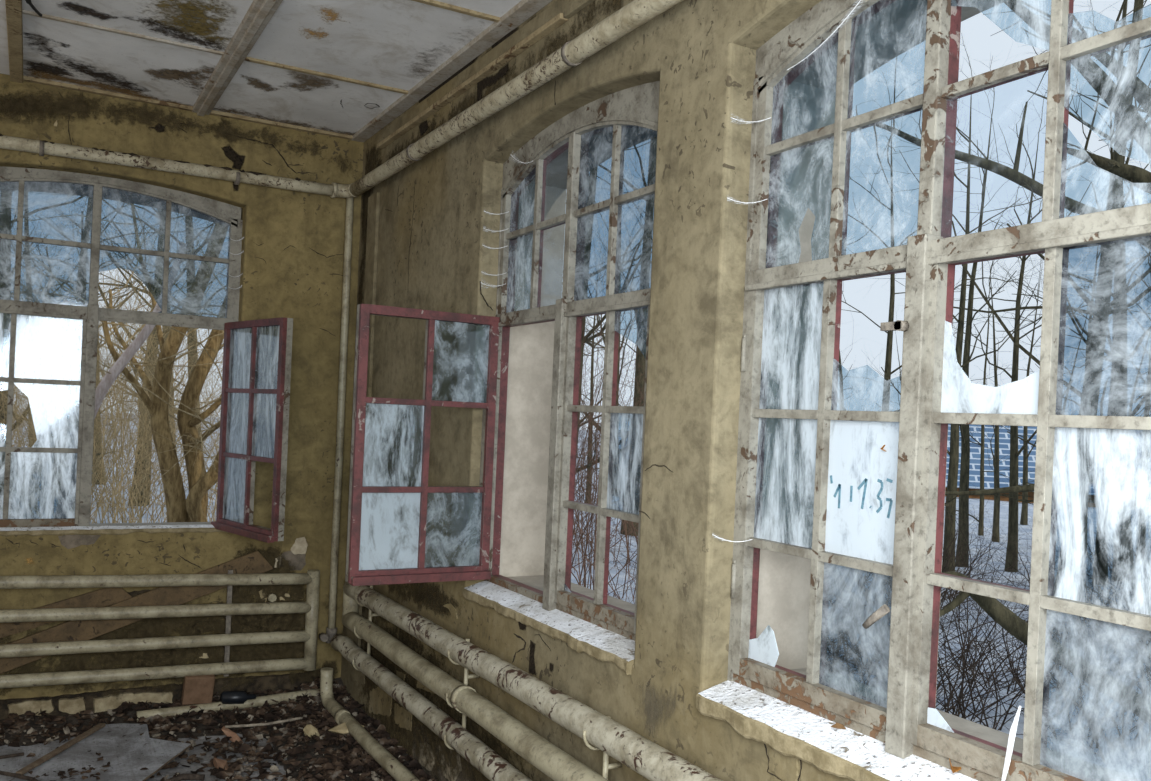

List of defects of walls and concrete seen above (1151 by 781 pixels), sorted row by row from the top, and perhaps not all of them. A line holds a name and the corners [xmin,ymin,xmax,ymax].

damp [62,0,235,49]
damp [0,33,356,191]
damp [365,0,622,175]
damp [357,188,373,305]
damp [388,583,458,615]
damp [362,606,461,682]
crack [512,634,551,663]
damp [361,639,529,781]
peeling [769,747,852,781]